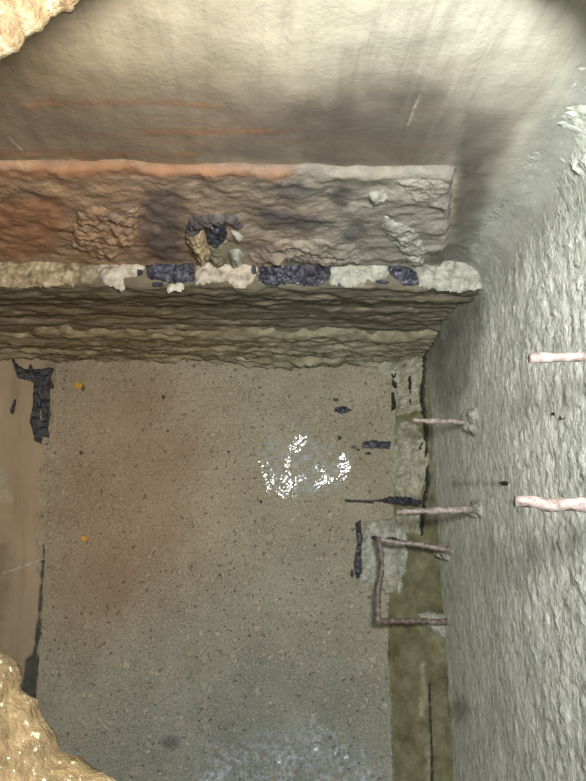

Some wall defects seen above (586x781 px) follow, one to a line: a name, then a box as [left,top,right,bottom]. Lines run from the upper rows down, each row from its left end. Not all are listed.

spalling [557,105,586,135]
spalling [560,152,586,178]
spalling [185,214,245,268]
peeling [388,356,429,500]
peeling [350,515,421,601]
crack [22,545,45,698]